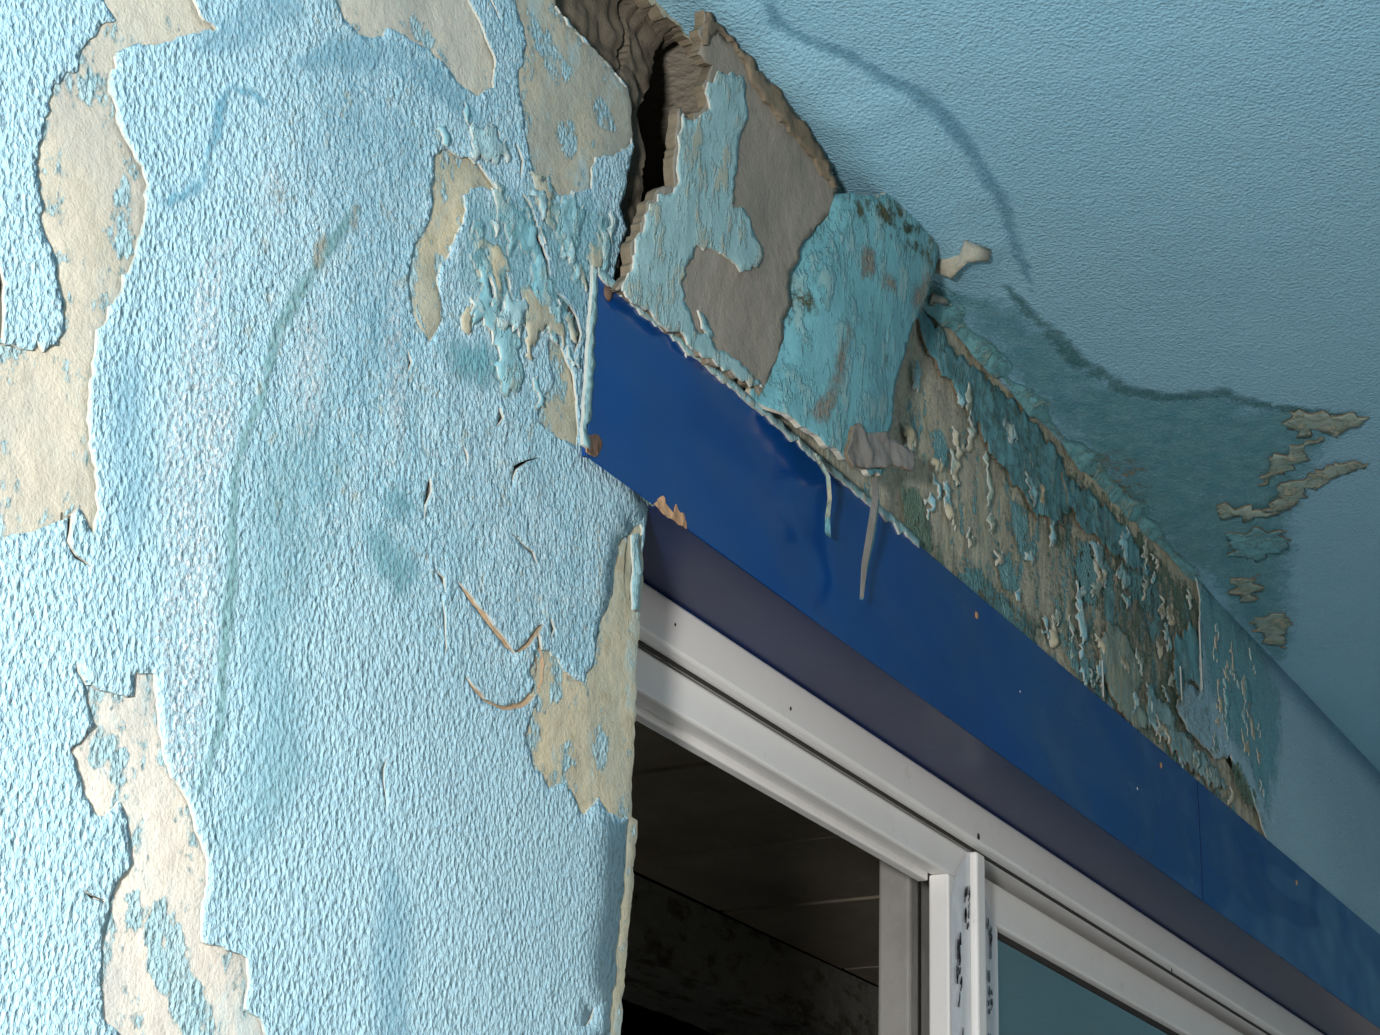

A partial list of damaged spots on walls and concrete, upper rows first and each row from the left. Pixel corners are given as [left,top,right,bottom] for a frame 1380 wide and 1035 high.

crack [0,274,8,339]
peeling [0,0,215,541]
leakage [790,290,815,310]
peeling [336,0,1369,837]
leakage [854,199,933,265]
leakage [938,287,1342,803]
peeling [70,668,263,1035]